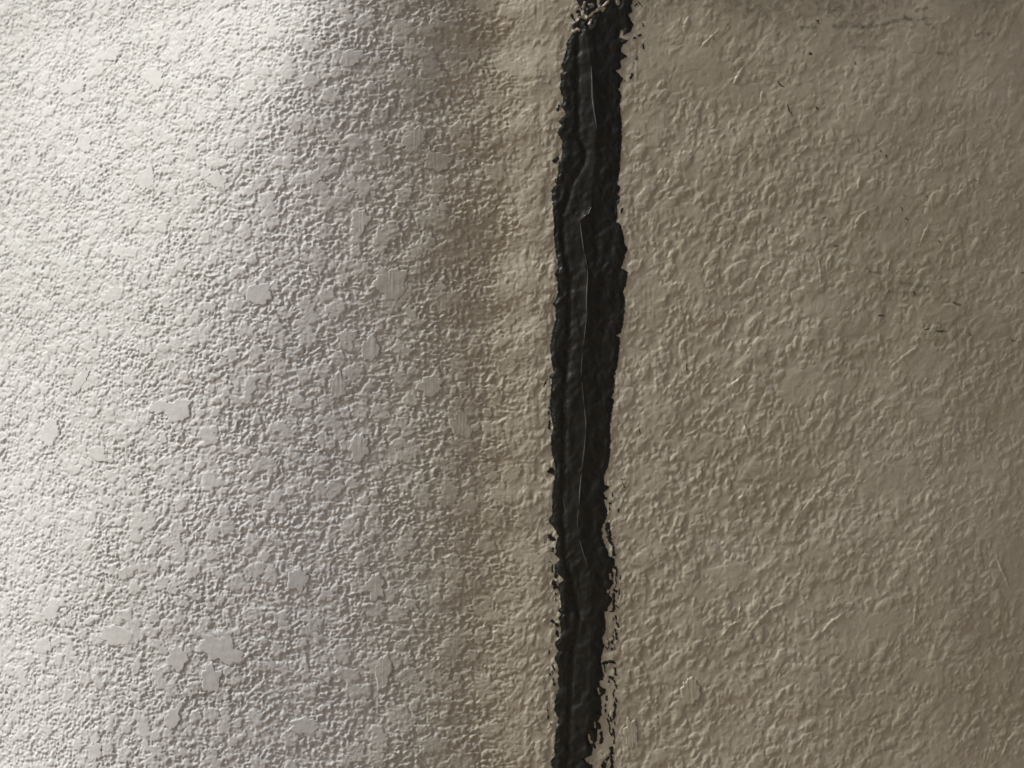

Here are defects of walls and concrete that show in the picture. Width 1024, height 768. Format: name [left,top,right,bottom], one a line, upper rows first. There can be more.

crack [538,0,644,768]